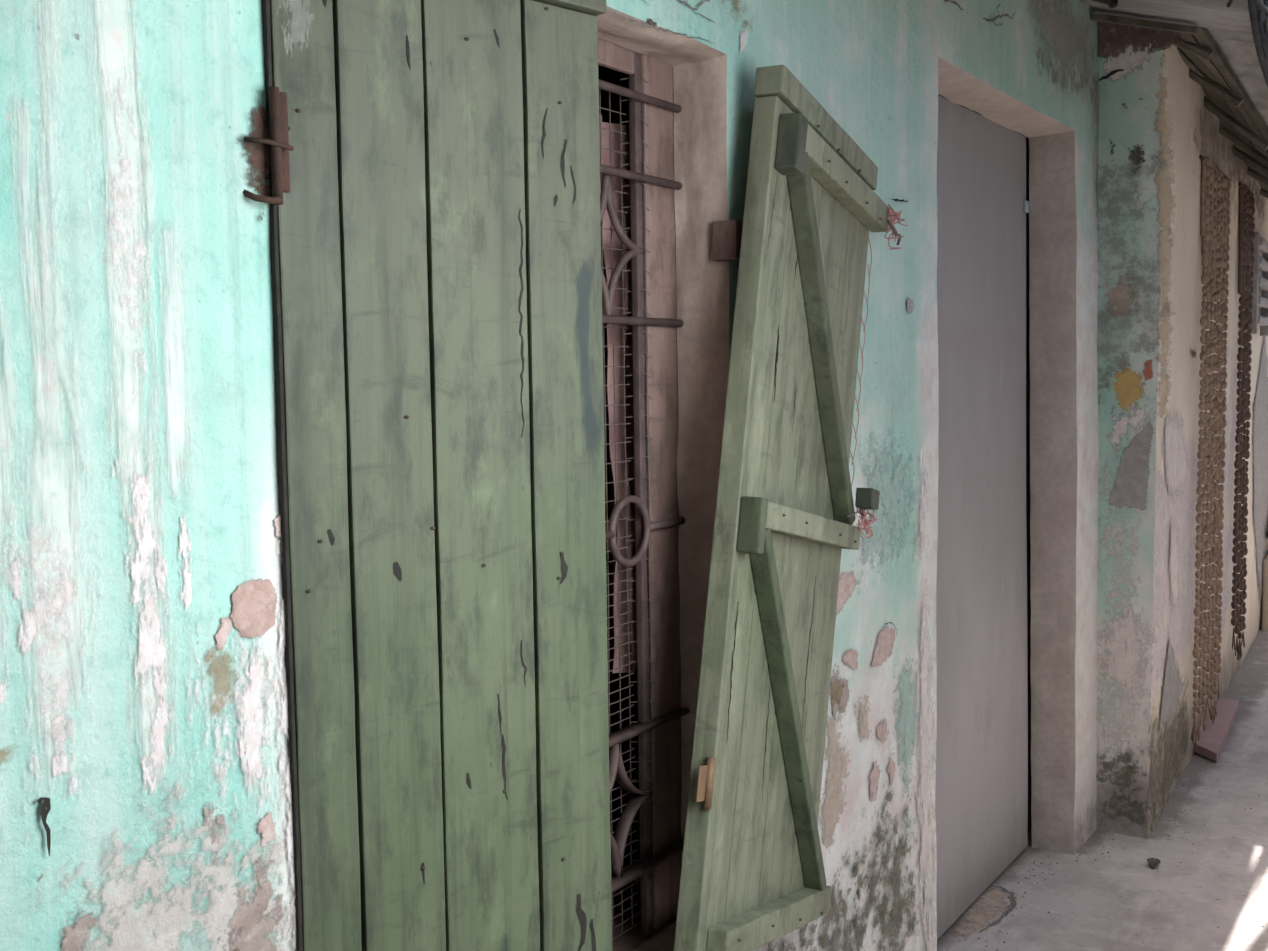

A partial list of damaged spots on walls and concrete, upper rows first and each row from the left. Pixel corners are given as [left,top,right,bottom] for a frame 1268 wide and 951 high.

crack [607,0,714,44]
crack [944,0,1017,26]
flaking render [1097,13,1180,81]
rust [244,99,271,197]
peeling [1106,77,1189,502]
peeling [4,518,88,794]
peeling [112,460,192,794]
spalling [37,797,51,856]
flaking render [60,578,296,951]
water stain [768,791,919,951]
peeling [819,586,937,951]
water stain [1096,677,1190,831]